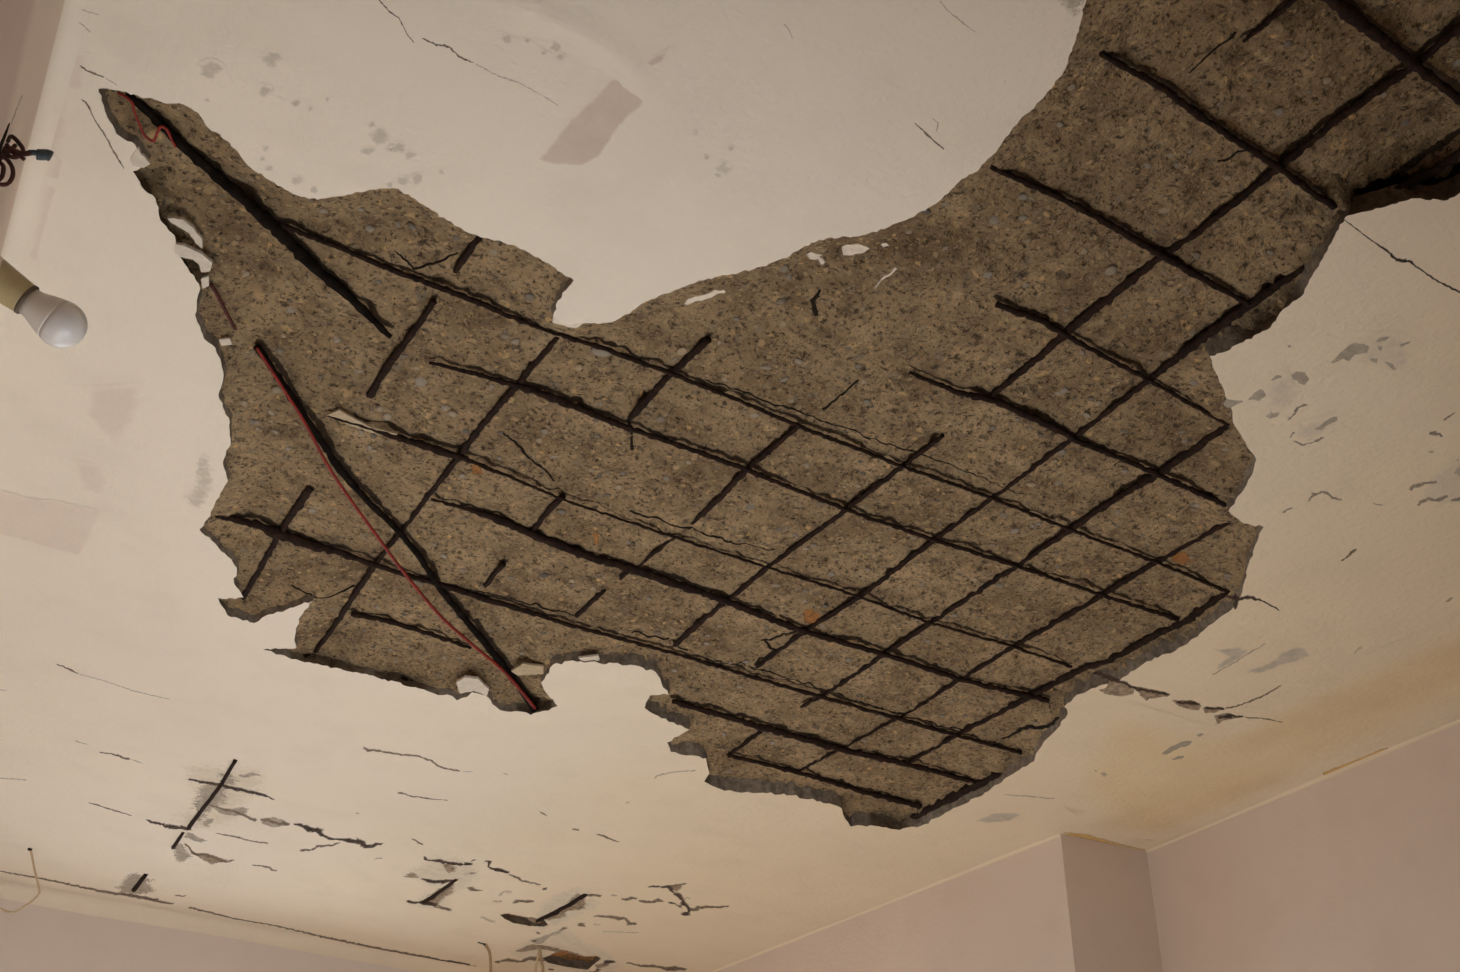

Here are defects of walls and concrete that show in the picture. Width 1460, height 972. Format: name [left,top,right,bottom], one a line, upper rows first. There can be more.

crack [379,0,473,63]
crack [1345,220,1460,293]
spalling [105,0,1460,822]
spalling [89,759,277,864]
crack [364,747,460,801]
spalling [116,874,156,894]
spalling [396,839,486,915]
spalling [494,883,729,972]